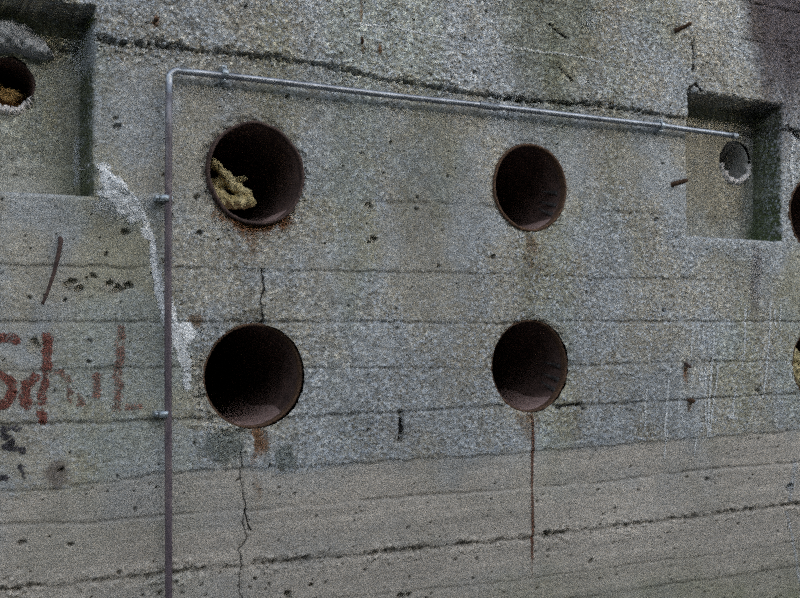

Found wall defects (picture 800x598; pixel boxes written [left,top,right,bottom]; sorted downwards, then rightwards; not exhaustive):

crack [238,446,252,598]